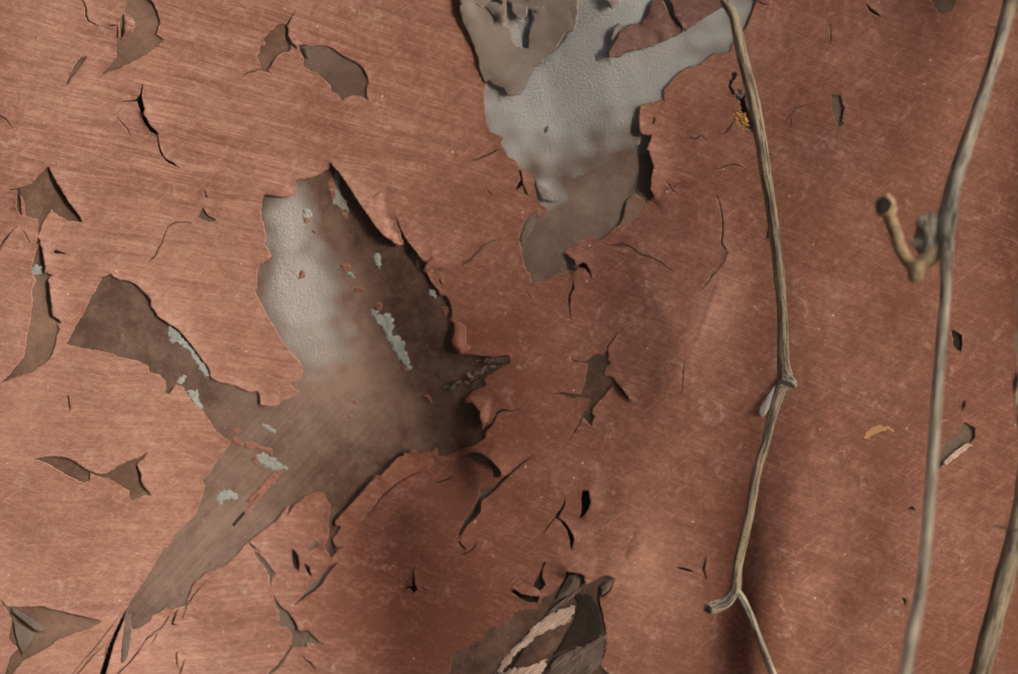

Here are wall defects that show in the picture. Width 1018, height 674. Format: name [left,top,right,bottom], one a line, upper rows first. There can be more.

peeling [102,0,163,74]
peeling [242,11,369,100]
crack [120,85,179,168]
peeling [459,0,773,282]
peeling [1,163,520,674]
peeling [554,350,628,441]
peeling [938,423,975,468]
peeling [0,600,101,674]
crack [73,590,198,674]
peeling [448,572,615,674]